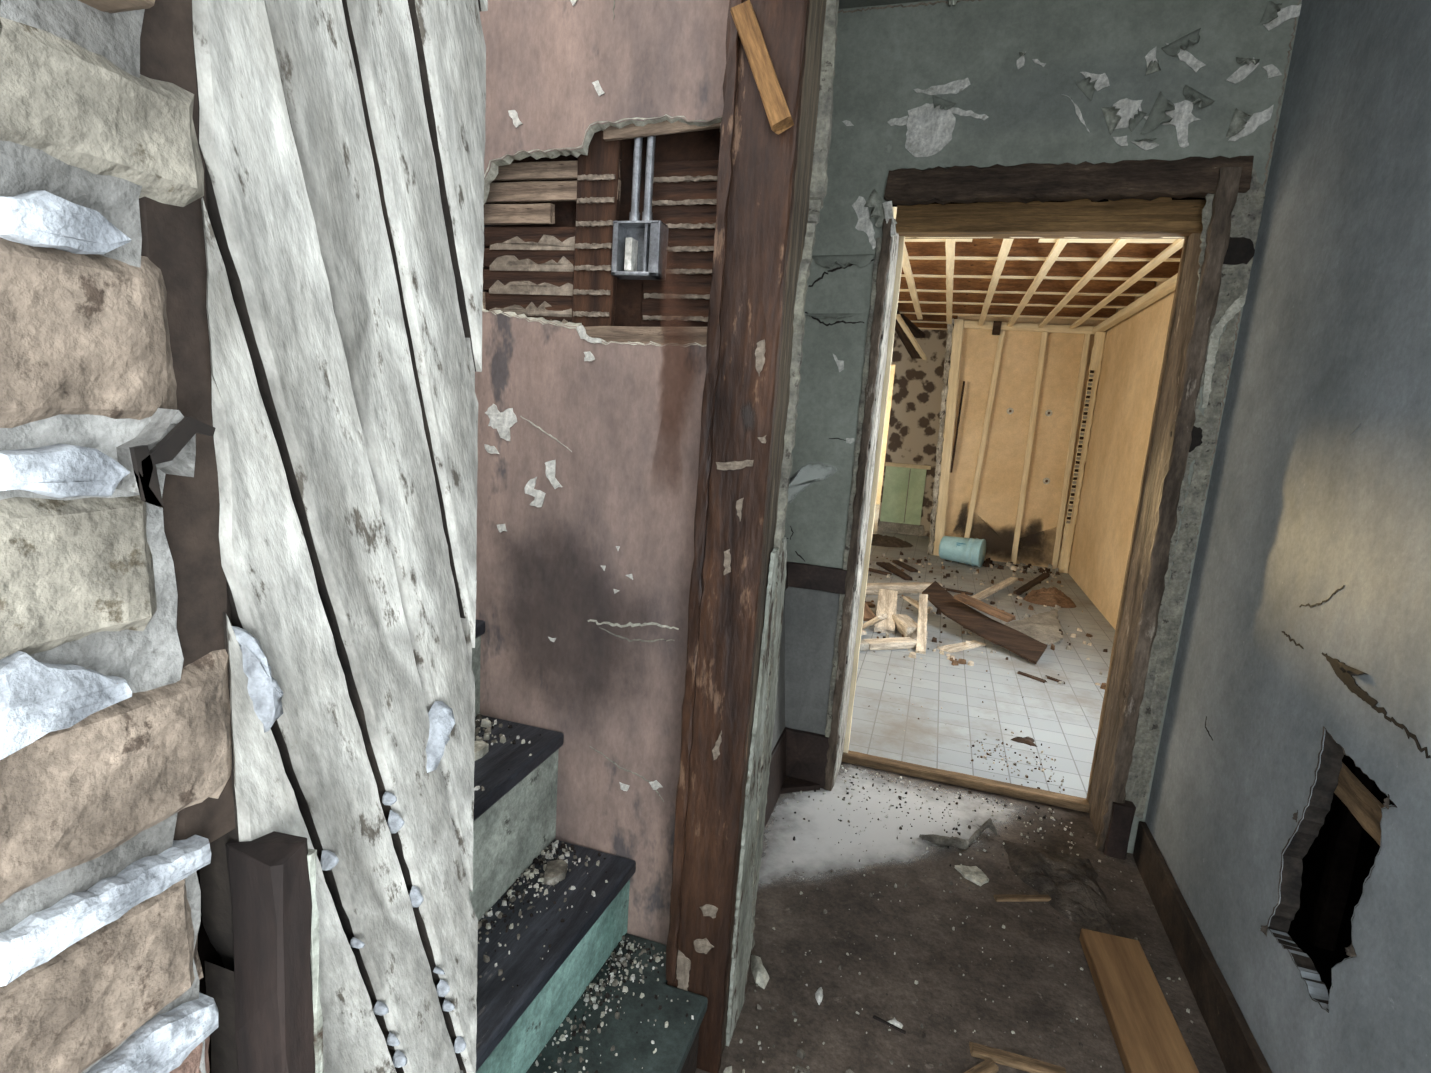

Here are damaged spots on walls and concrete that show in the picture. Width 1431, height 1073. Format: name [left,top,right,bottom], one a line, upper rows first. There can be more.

peeling [508,110,522,128]
peeling [888,78,988,157]
peeling [1017,52,1046,69]
peeling [1062,28,1214,150]
flaking render [484,114,722,204]
flaking render [482,301,665,361]
flaking render [1125,0,1302,819]
crack [588,619,679,642]
spalling [1260,726,1397,1013]